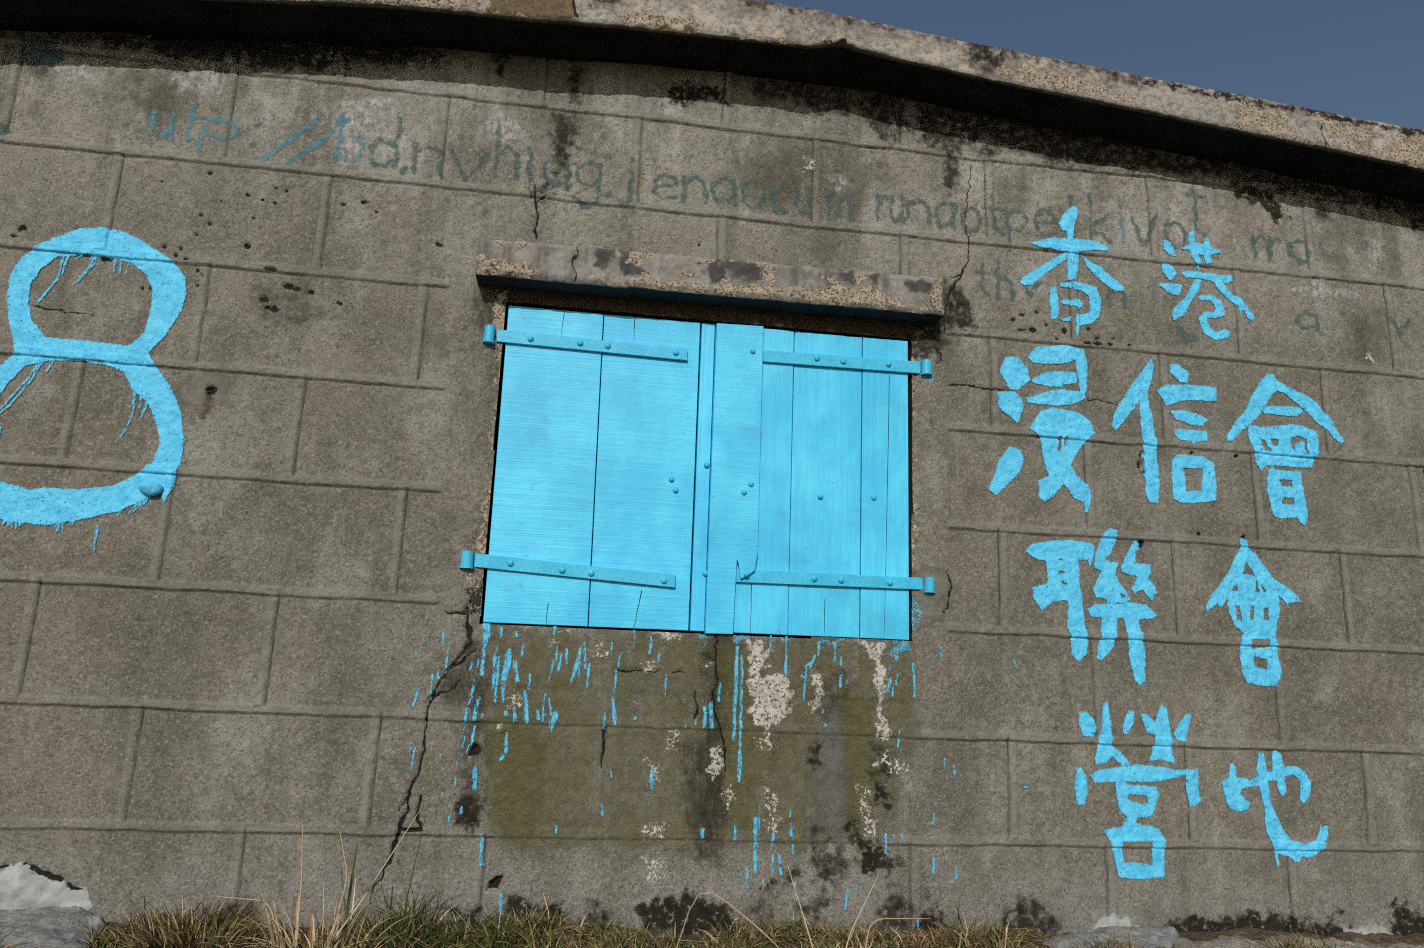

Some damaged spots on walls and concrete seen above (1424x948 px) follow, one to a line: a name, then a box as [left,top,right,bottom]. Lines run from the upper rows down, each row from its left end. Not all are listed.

water stain [668,80,729,107]
water stain [754,74,1424,230]
crack [934,166,1010,391]
crack [369,606,476,902]
water stain [449,645,538,845]
water stain [685,644,754,829]
water stain [760,639,909,890]
water stain [431,895,608,927]
water stain [635,888,734,936]
water stain [873,896,949,931]
water stain [1168,909,1352,936]
water stain [1391,897,1424,936]